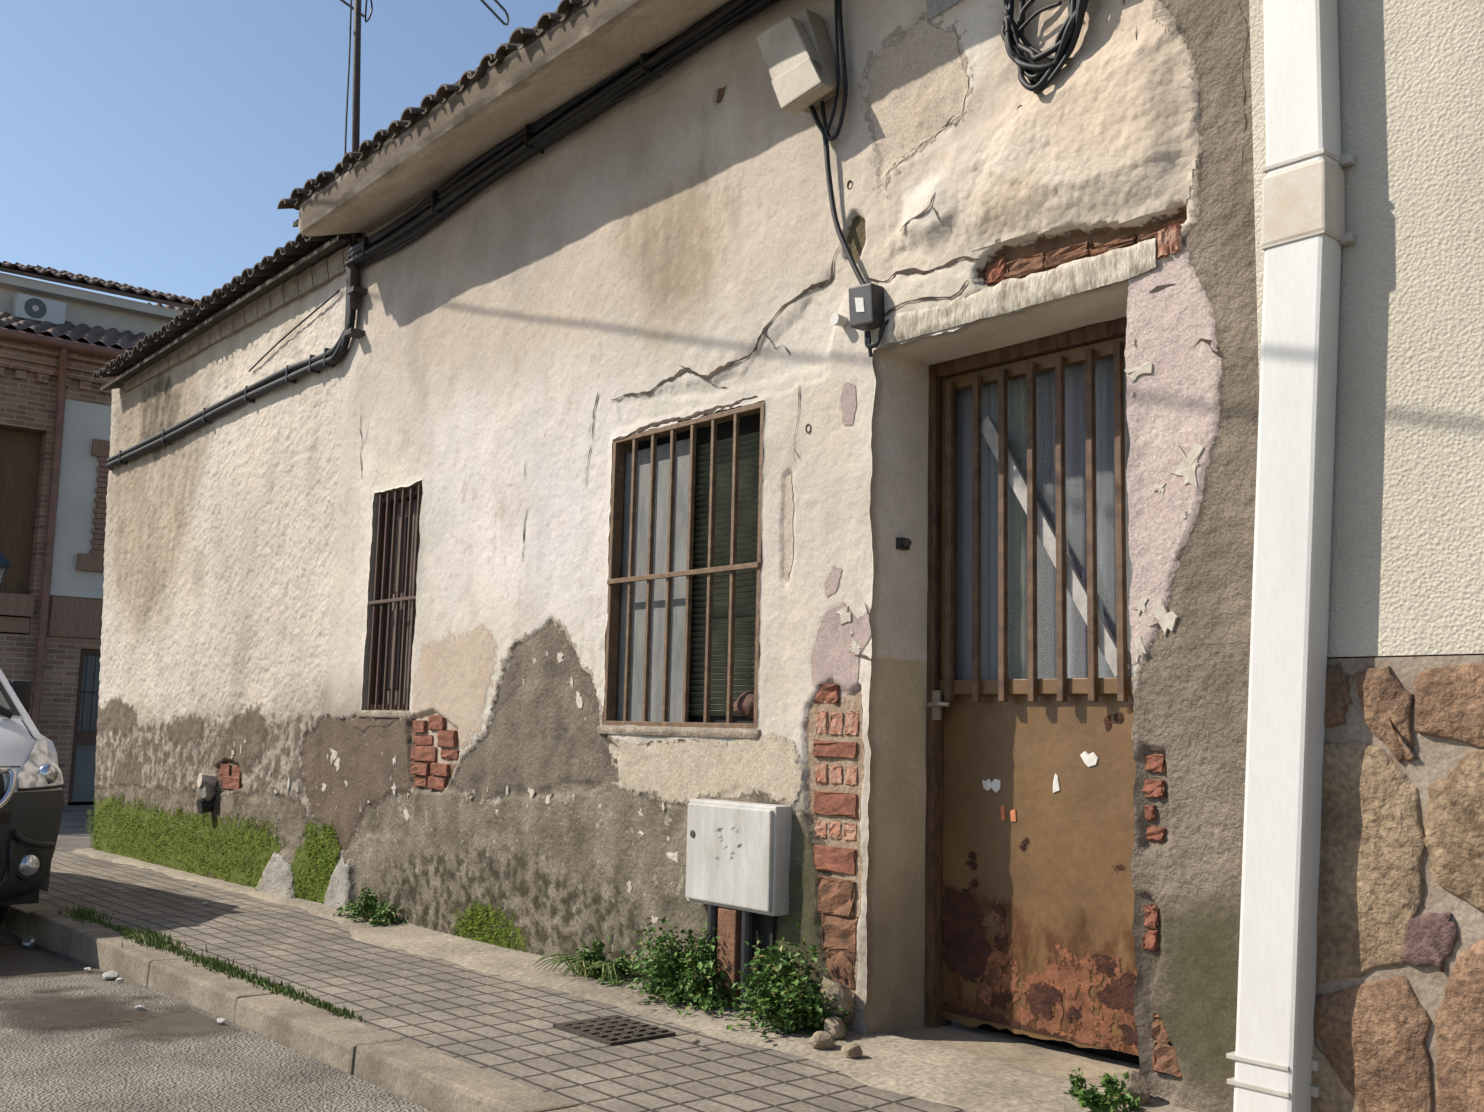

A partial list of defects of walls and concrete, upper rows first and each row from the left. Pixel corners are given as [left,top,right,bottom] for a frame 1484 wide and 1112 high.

crack [585,192,985,488]
flaking render [976,0,1259,1112]
water stain [94,694,314,800]
flaking render [94,565,871,997]
corrosion [1103,705,1133,731]
corrosion [943,851,1139,1056]